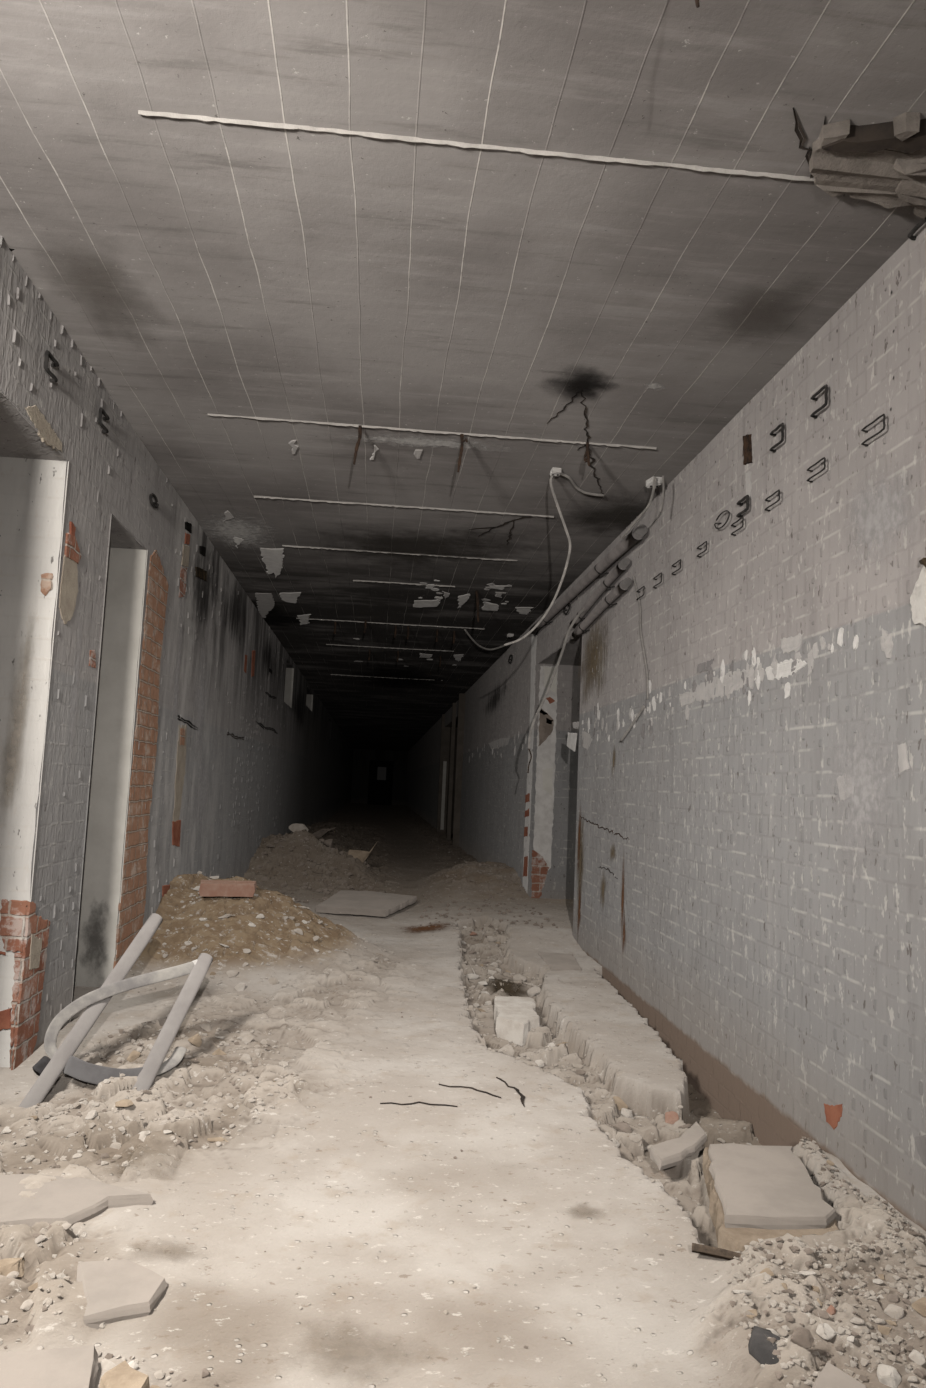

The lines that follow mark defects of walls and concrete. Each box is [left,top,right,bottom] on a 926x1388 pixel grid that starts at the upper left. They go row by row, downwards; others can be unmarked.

spalling [809,112,926,219]
crack [549,396,602,493]
peeling [413,580,533,615]
peeling [880,629,894,659]
flaking render [113,522,207,969]
peeling [469,627,859,898]
flaking render [0,899,50,1070]
crack [380,1077,525,1107]
peeling [914,1135,926,1166]